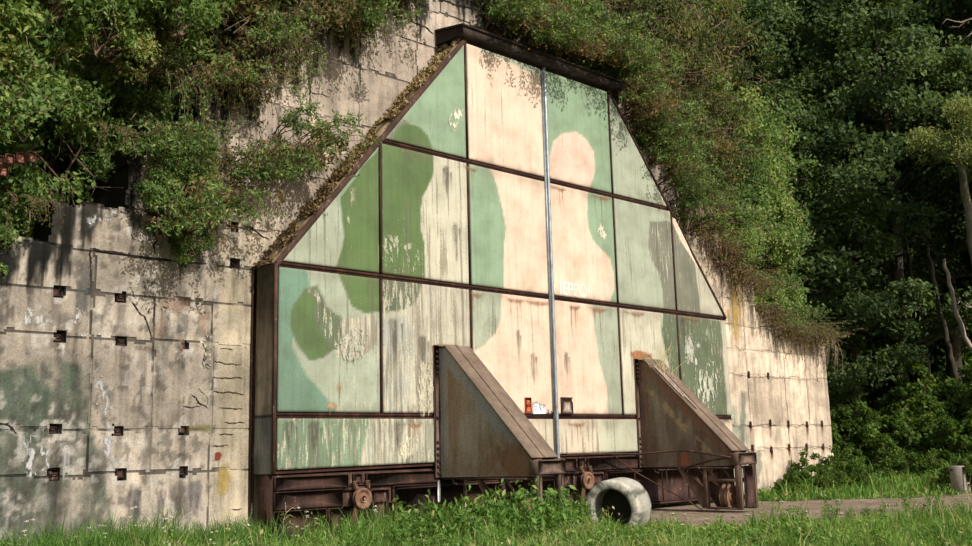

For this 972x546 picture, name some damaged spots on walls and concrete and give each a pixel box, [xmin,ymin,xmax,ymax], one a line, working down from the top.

water stain [0,209,68,286]
crack [132,302,155,339]
corrosion [631,351,652,359]
peeling [685,336,718,404]
peeling [22,435,50,477]